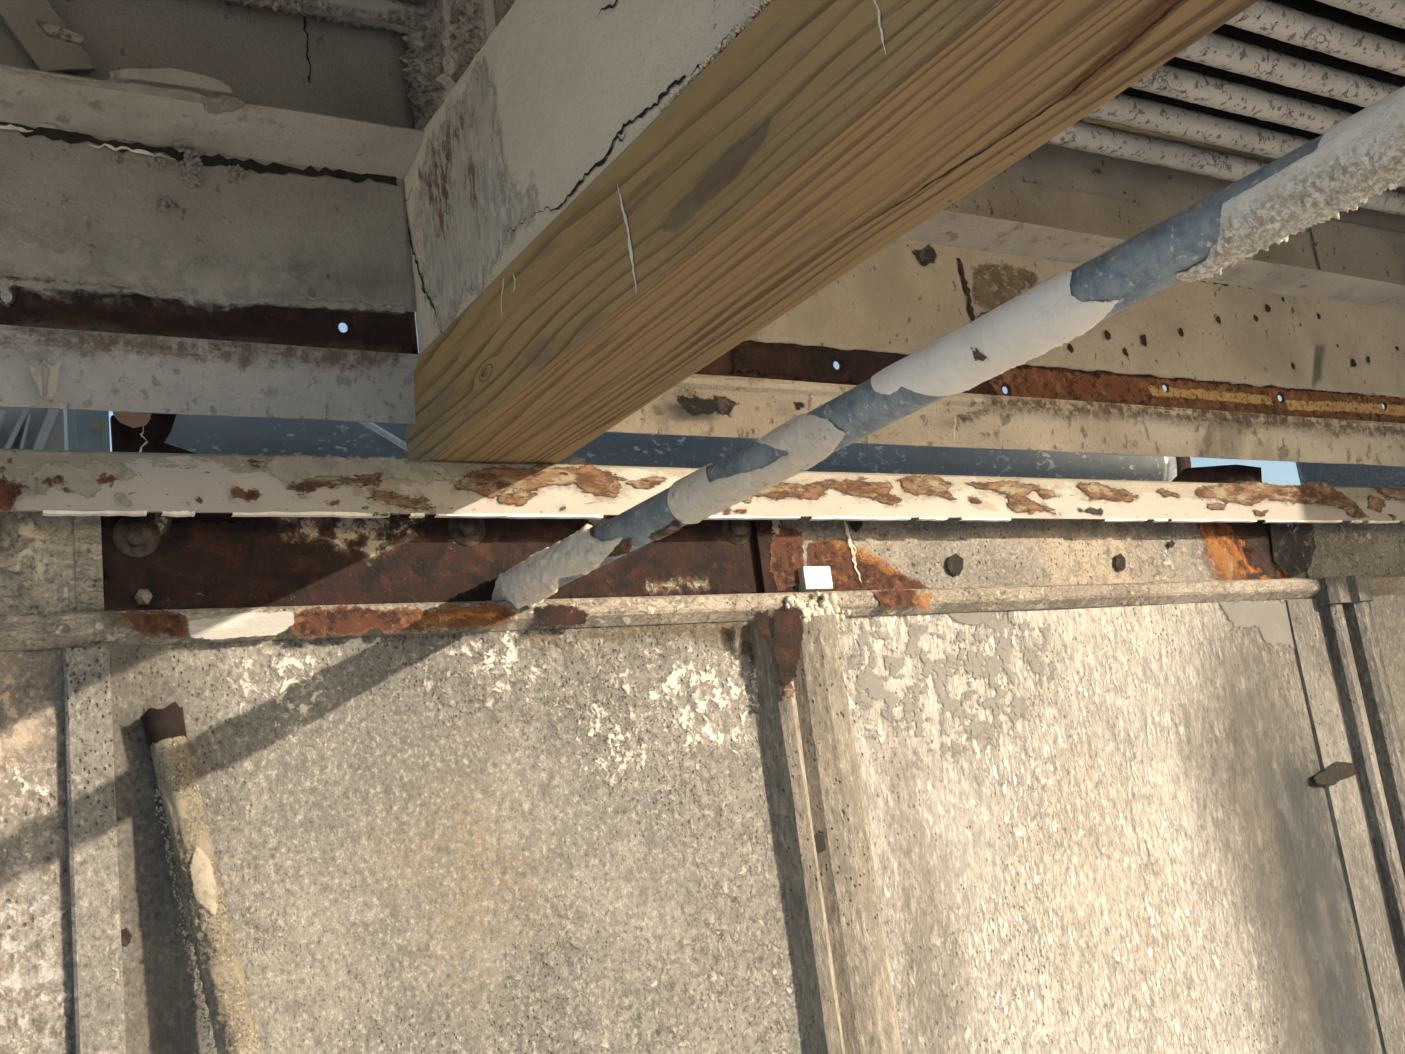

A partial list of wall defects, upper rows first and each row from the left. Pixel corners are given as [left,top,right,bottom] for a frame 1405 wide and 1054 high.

crack [303,17,311,83]
crack [508,29,733,232]
peeling [419,115,477,240]
rust [0,285,414,367]
rust [732,342,907,385]
rust [989,367,1405,437]
rust [0,458,29,512]
rust [967,479,1059,514]
rust [1078,506,1104,516]
rust [100,496,612,640]
rust [1197,520,1288,580]
rust [533,519,932,701]